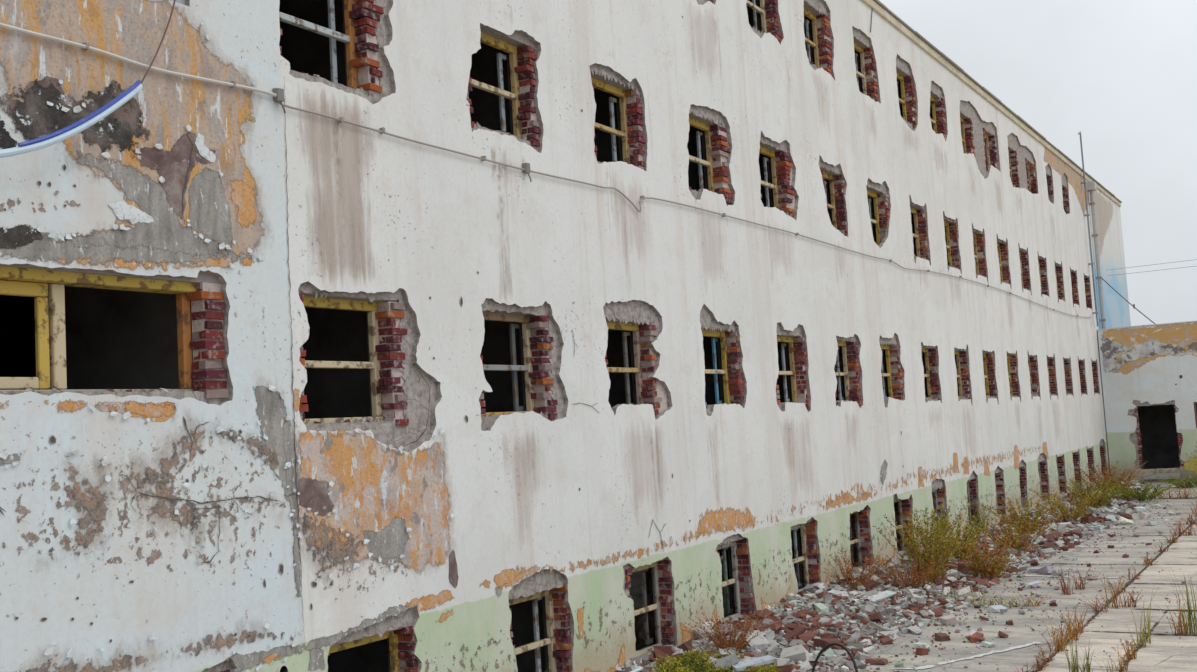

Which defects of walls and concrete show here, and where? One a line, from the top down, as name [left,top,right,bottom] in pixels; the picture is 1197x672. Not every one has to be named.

peeling [0,0,265,422]
spalling [921,346,940,402]
spalling [954,348,971,400]
peeling [982,322,1197,398]
peeling [0,282,459,610]
spalling [1128,400,1197,470]
spalling [650,439,1107,652]
flaking render [0,564,637,672]